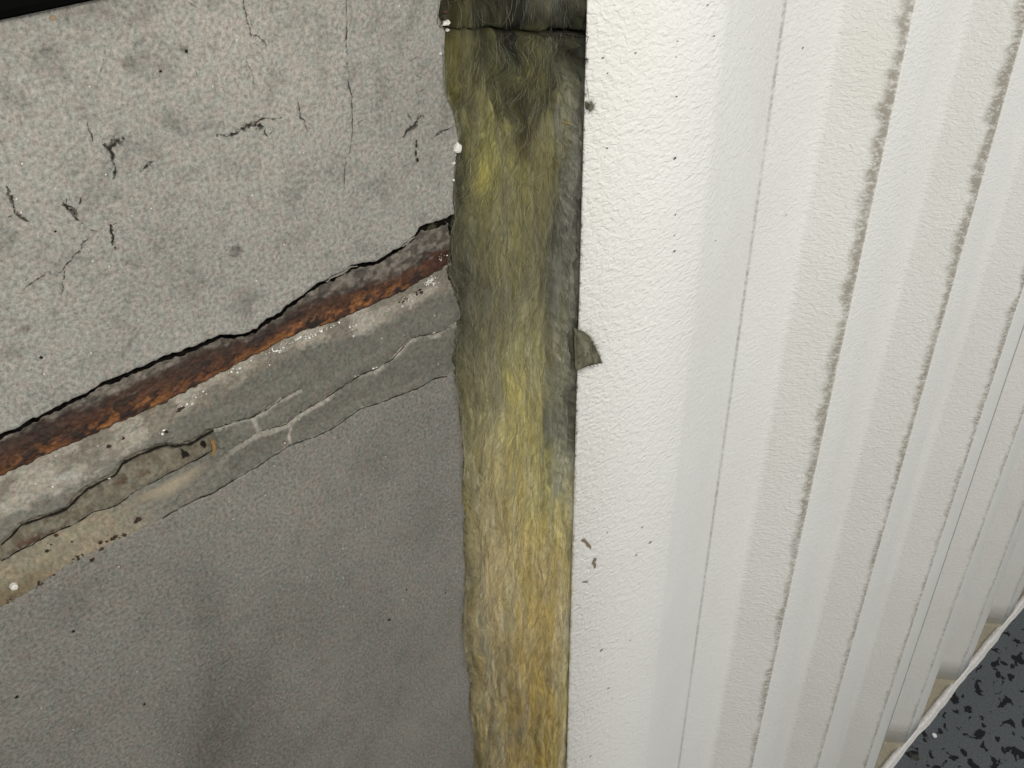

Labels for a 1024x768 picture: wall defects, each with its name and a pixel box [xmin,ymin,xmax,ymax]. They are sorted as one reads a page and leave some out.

crack [217,103,311,137]
crack [344,3,362,183]
crack [1,326,452,561]
spalling [0,215,460,607]